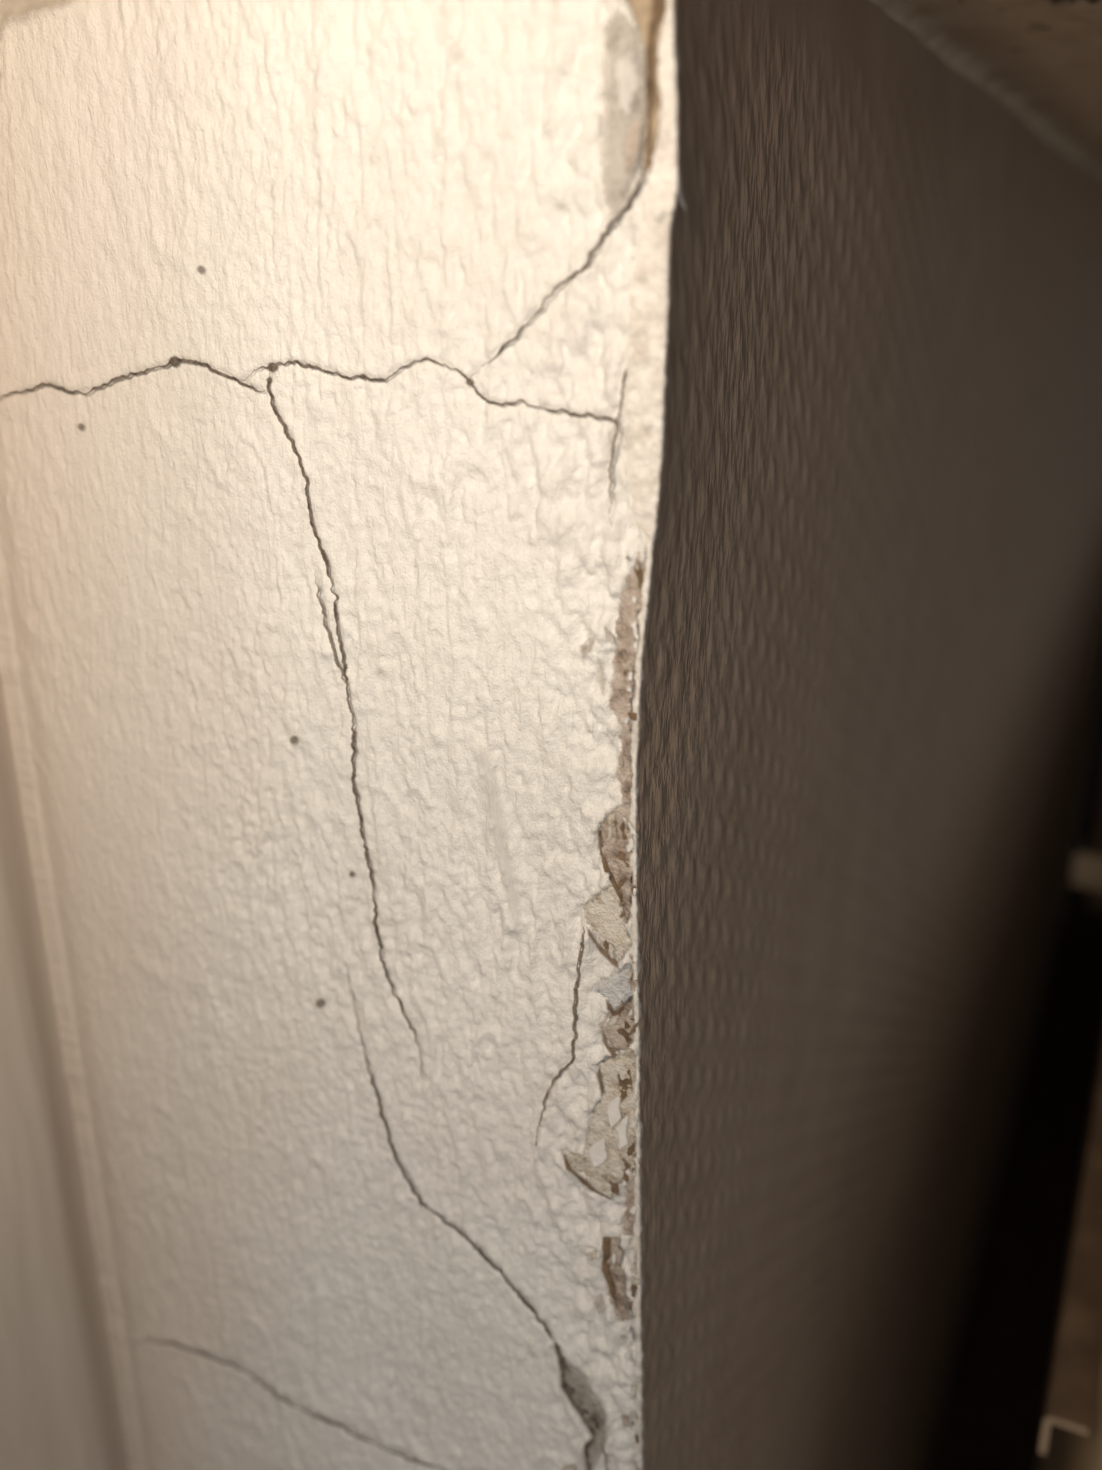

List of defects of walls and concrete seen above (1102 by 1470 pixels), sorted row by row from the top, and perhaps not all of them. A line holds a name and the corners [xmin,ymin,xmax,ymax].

crack [0,131,659,1079]
crack [353,999,566,1361]
crack [535,932,585,1146]
flaking render [557,543,645,1470]
crack [148,1340,443,1470]
crack [600,1443,608,1470]